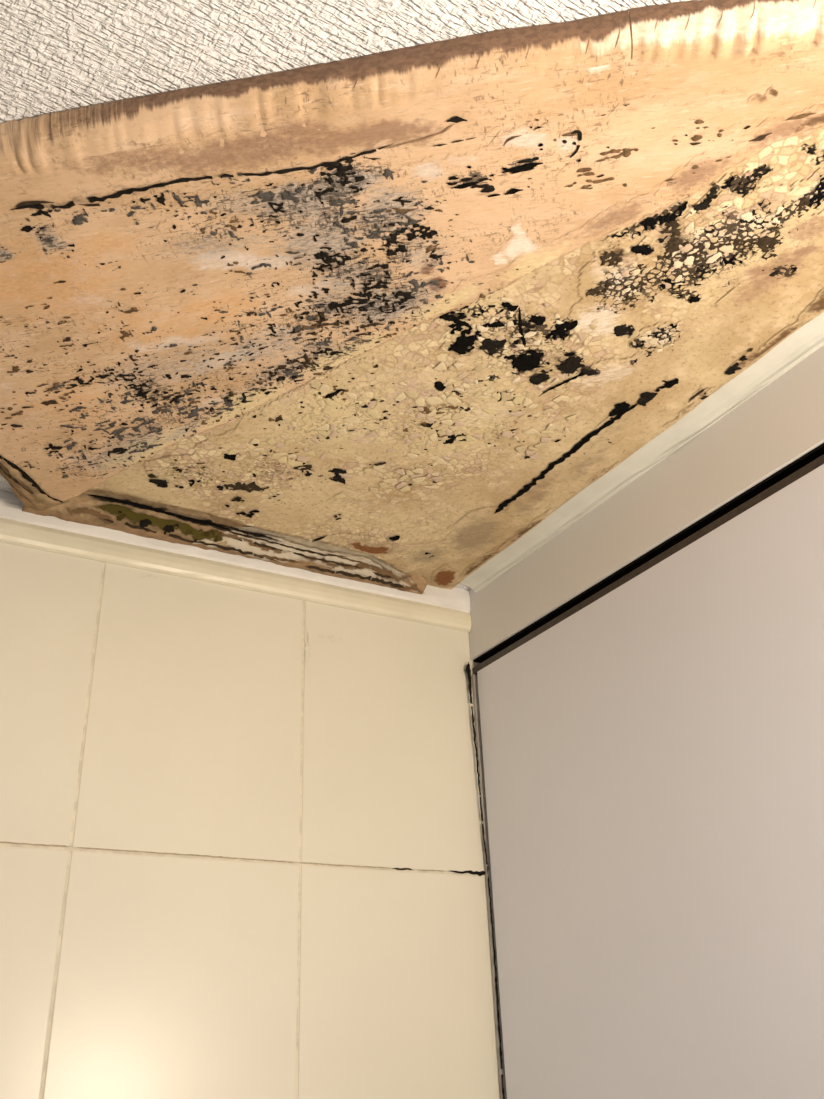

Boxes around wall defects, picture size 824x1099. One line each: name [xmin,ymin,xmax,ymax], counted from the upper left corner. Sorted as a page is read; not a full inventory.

peeling [629,0,824,60]
peeling [585,64,613,78]
crack [11,116,467,210]
peeling [397,152,484,182]
peeling [490,123,583,157]
leakage [0,10,824,594]